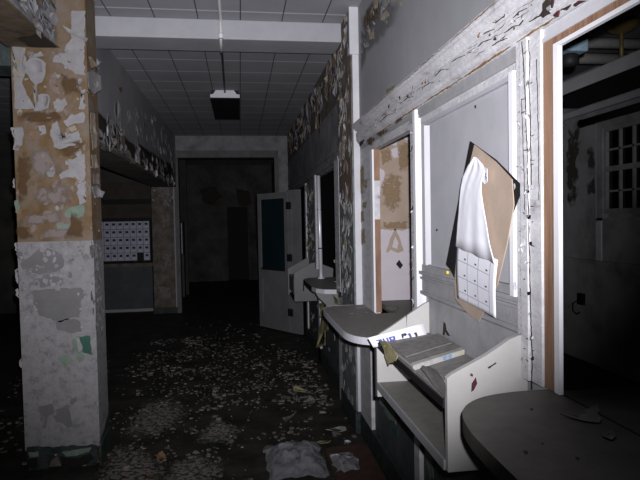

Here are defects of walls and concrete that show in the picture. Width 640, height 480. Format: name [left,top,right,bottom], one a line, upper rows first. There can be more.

peeling [11,0,175,367]
peeling [287,15,429,305]
peeling [359,0,402,54]
crack [371,0,540,389]
peeling [539,0,585,17]